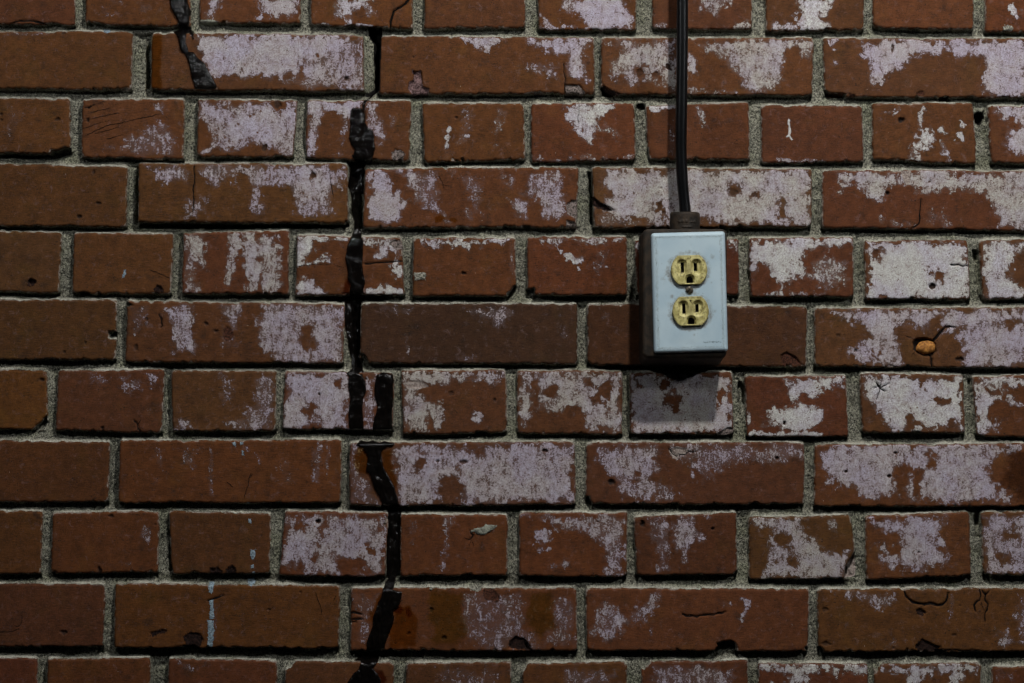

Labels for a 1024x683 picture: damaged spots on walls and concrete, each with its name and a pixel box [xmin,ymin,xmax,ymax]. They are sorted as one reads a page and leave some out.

crack [362,0,409,117]
spalling [408,69,429,97]
water stain [526,0,839,94]
water stain [859,38,1024,155]
crack [297,260,403,268]
water stain [539,155,853,297]
water stain [170,0,626,683]
water stain [820,106,1024,574]
crack [905,326,953,367]
water stain [517,371,845,504]
crack [904,591,948,606]
crack [973,589,990,621]